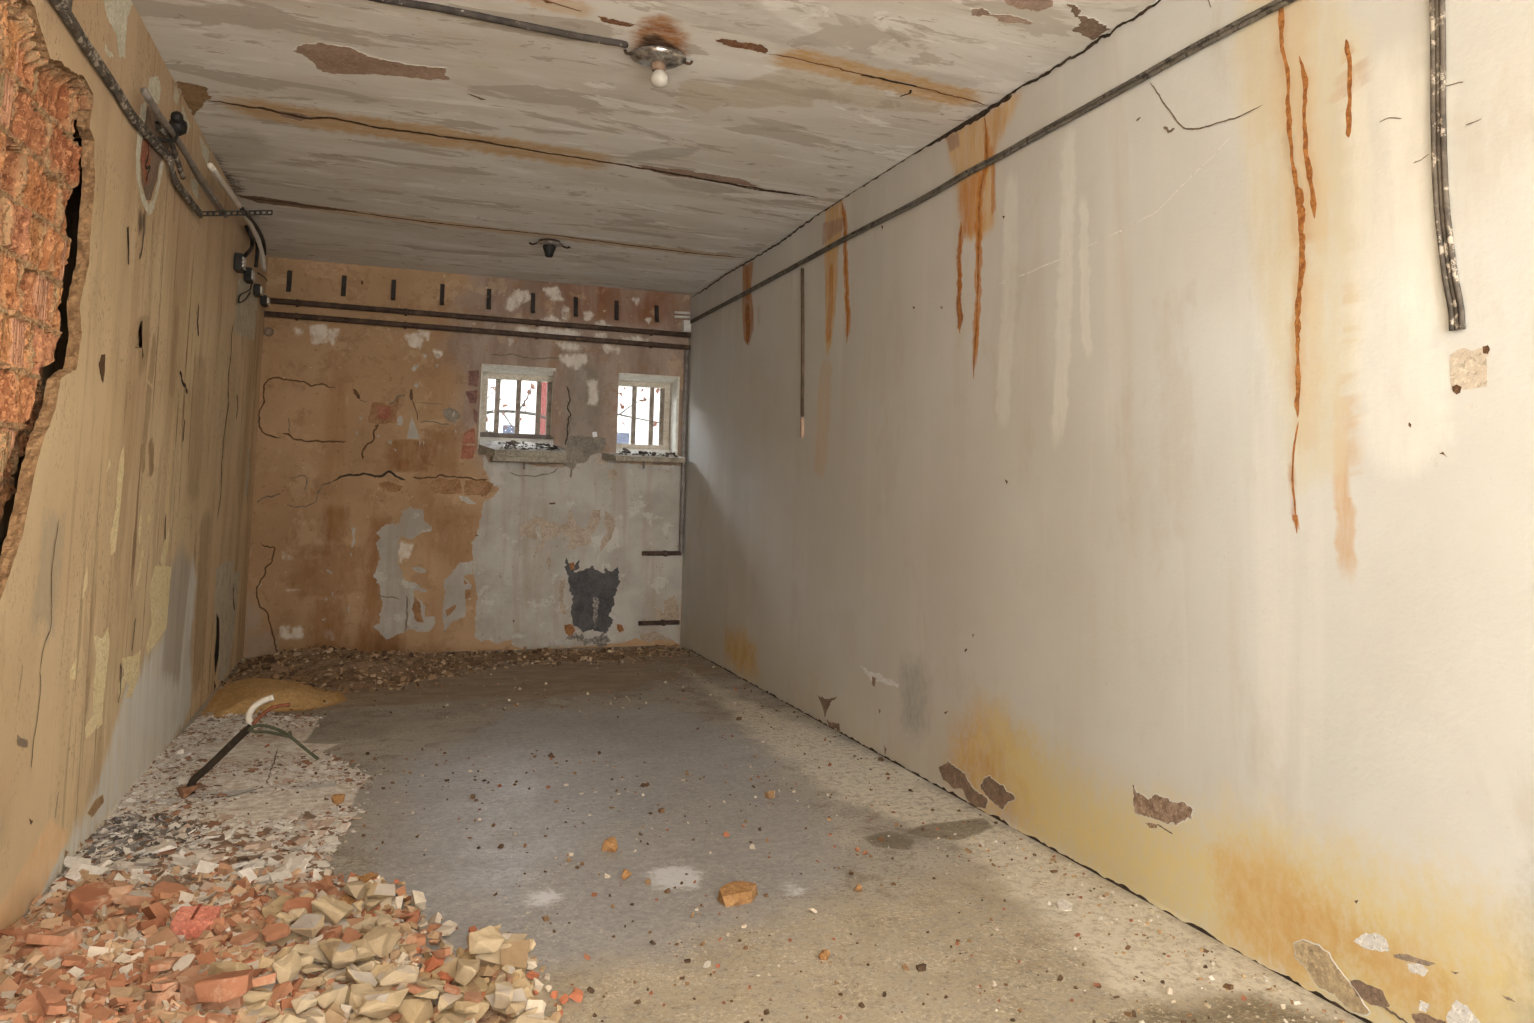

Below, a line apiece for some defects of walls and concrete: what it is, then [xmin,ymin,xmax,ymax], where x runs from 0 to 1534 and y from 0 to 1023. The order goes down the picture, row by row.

spalling [0,0,99,599]
crack [180,371,188,440]
crack [256,544,278,652]
crack [197,304,487,519]
peeling [373,285,683,649]
corrosion [811,198,852,485]
corrosion [941,85,1028,378]
corrosion [1278,8,1317,533]
corrosion [1344,39,1352,137]
peeling [1132,783,1194,834]
leakage [929,666,1534,1023]
peeling [1293,933,1480,1023]